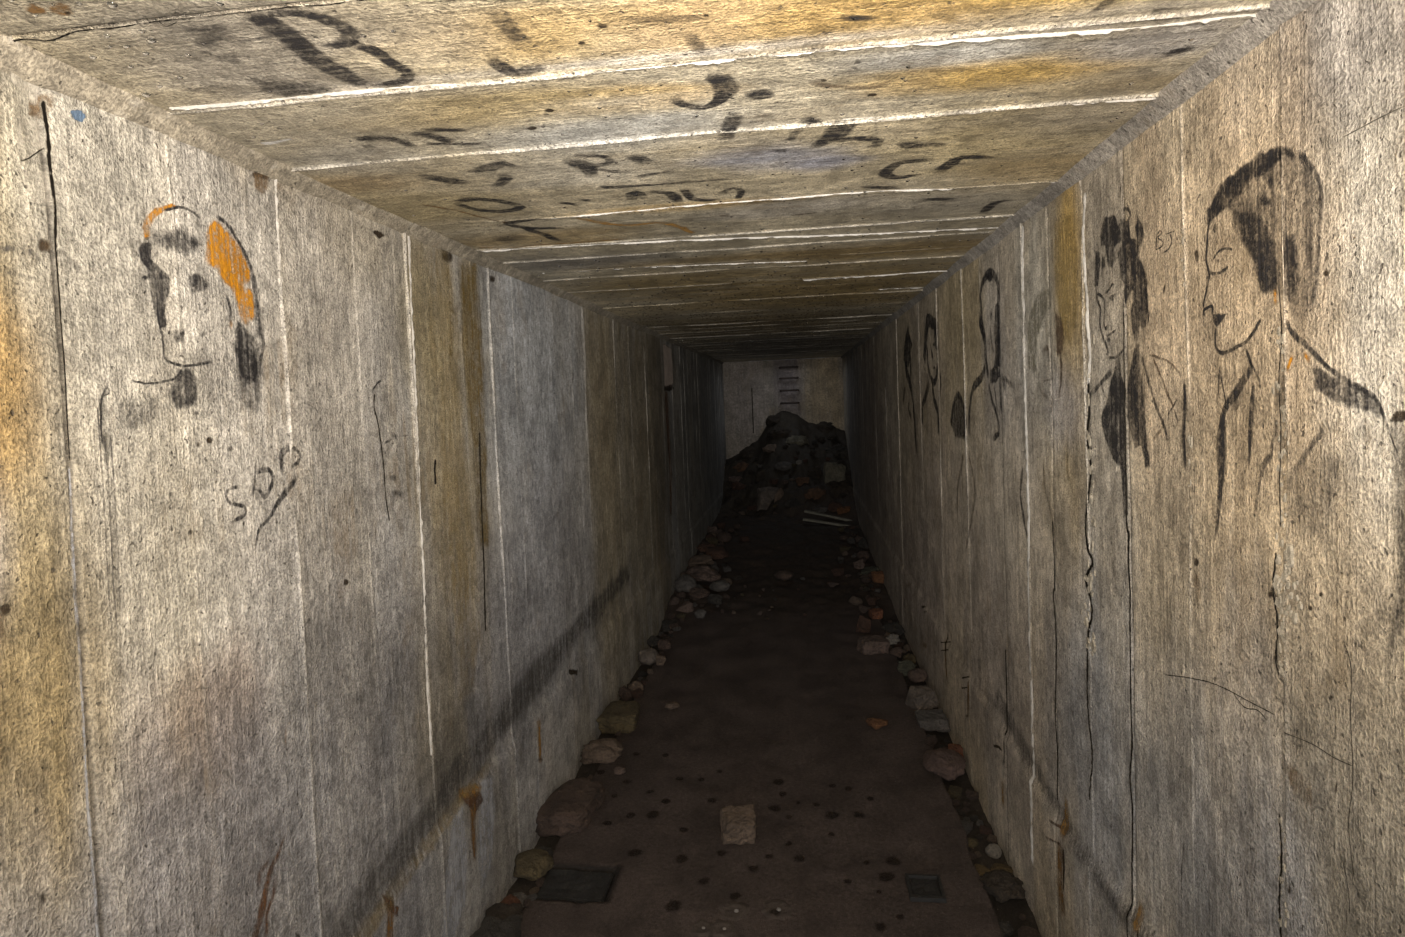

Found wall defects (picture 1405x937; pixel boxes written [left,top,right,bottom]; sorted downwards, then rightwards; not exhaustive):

crack [1268,285,1282,675]
crack [1052,304,1133,937]
rust [459,786,483,857]
crack [1166,642,1355,913]
crack [1276,813,1284,937]